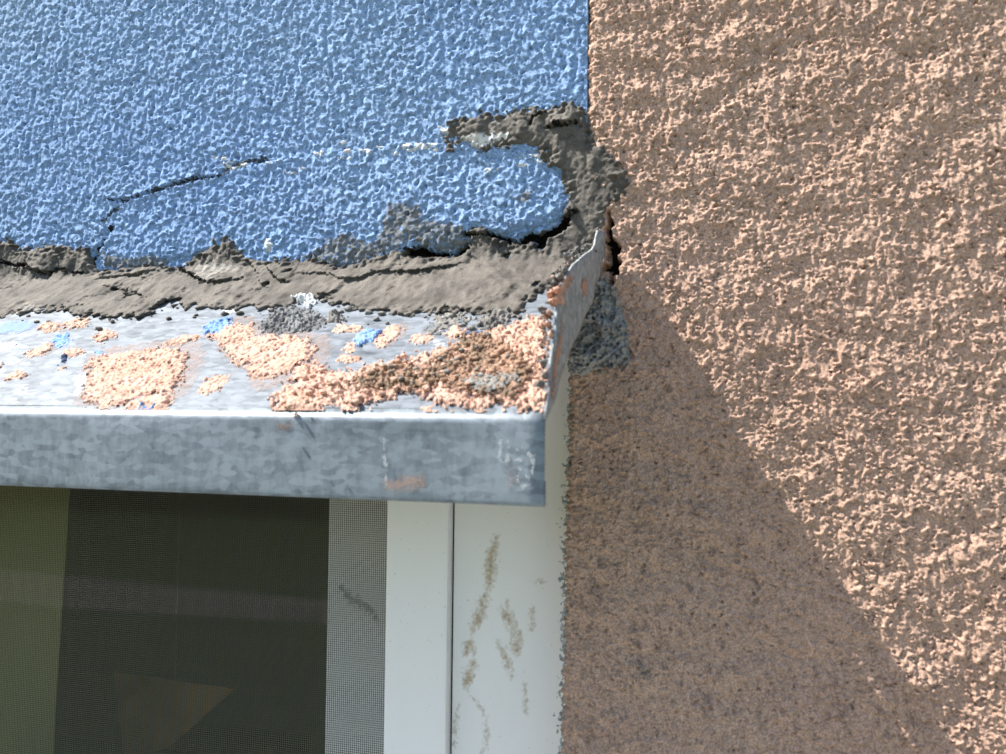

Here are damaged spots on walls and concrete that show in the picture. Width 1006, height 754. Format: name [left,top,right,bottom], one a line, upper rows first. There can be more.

peeling [337,125,449,160]
peeling [212,155,249,170]
crack [0,155,267,298]
peeling [297,202,472,268]
peeling [102,251,169,269]
peeling [63,318,91,329]